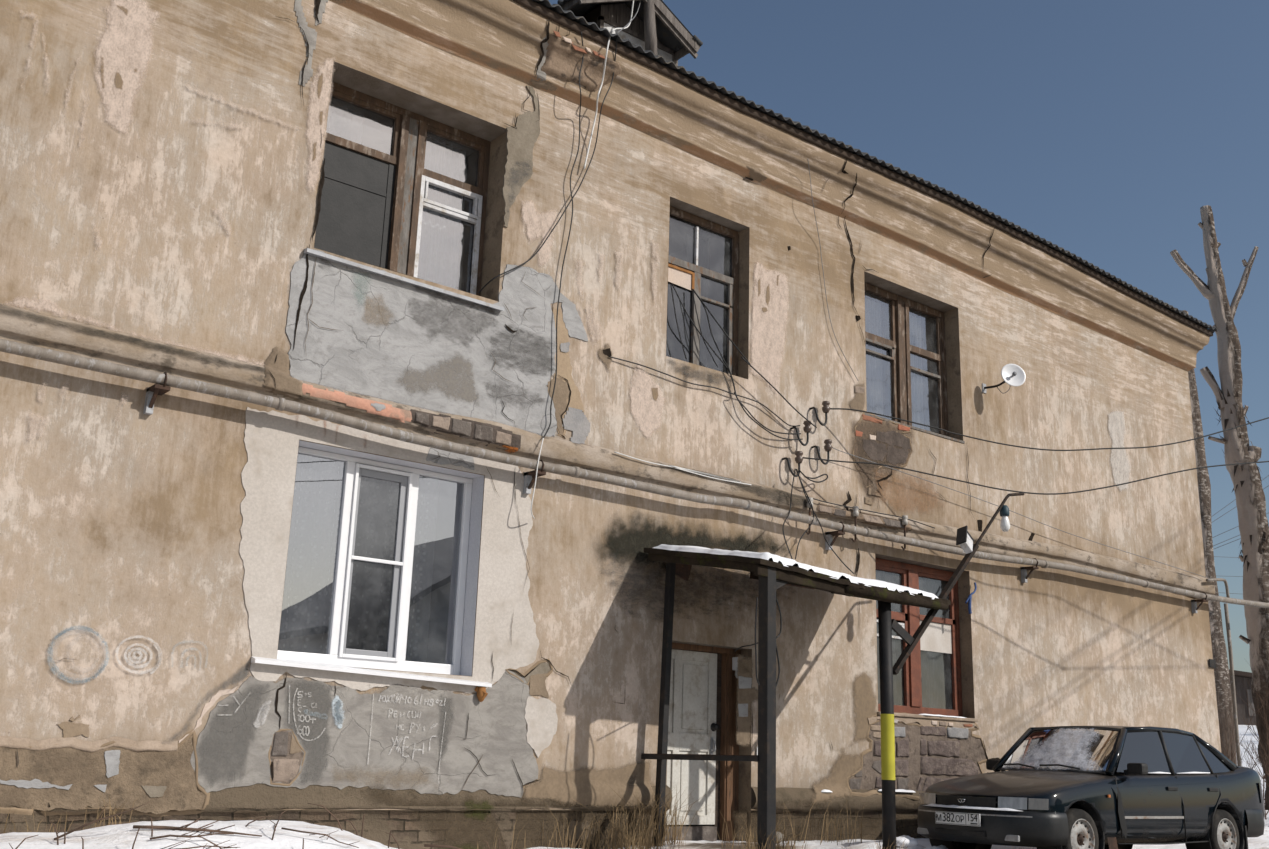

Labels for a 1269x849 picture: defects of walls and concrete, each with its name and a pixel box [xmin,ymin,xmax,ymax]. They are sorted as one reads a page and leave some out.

peeling [96,0,158,133]
crack [275,0,328,105]
crack [504,18,570,129]
crack [293,135,325,350]
crack [822,159,879,347]
spalling [301,383,521,451]
spalling [816,384,913,532]
water stain [611,530,758,559]
spalling [0,665,249,817]
spalling [268,729,306,786]
spalling [505,651,654,807]
spalling [813,673,987,803]